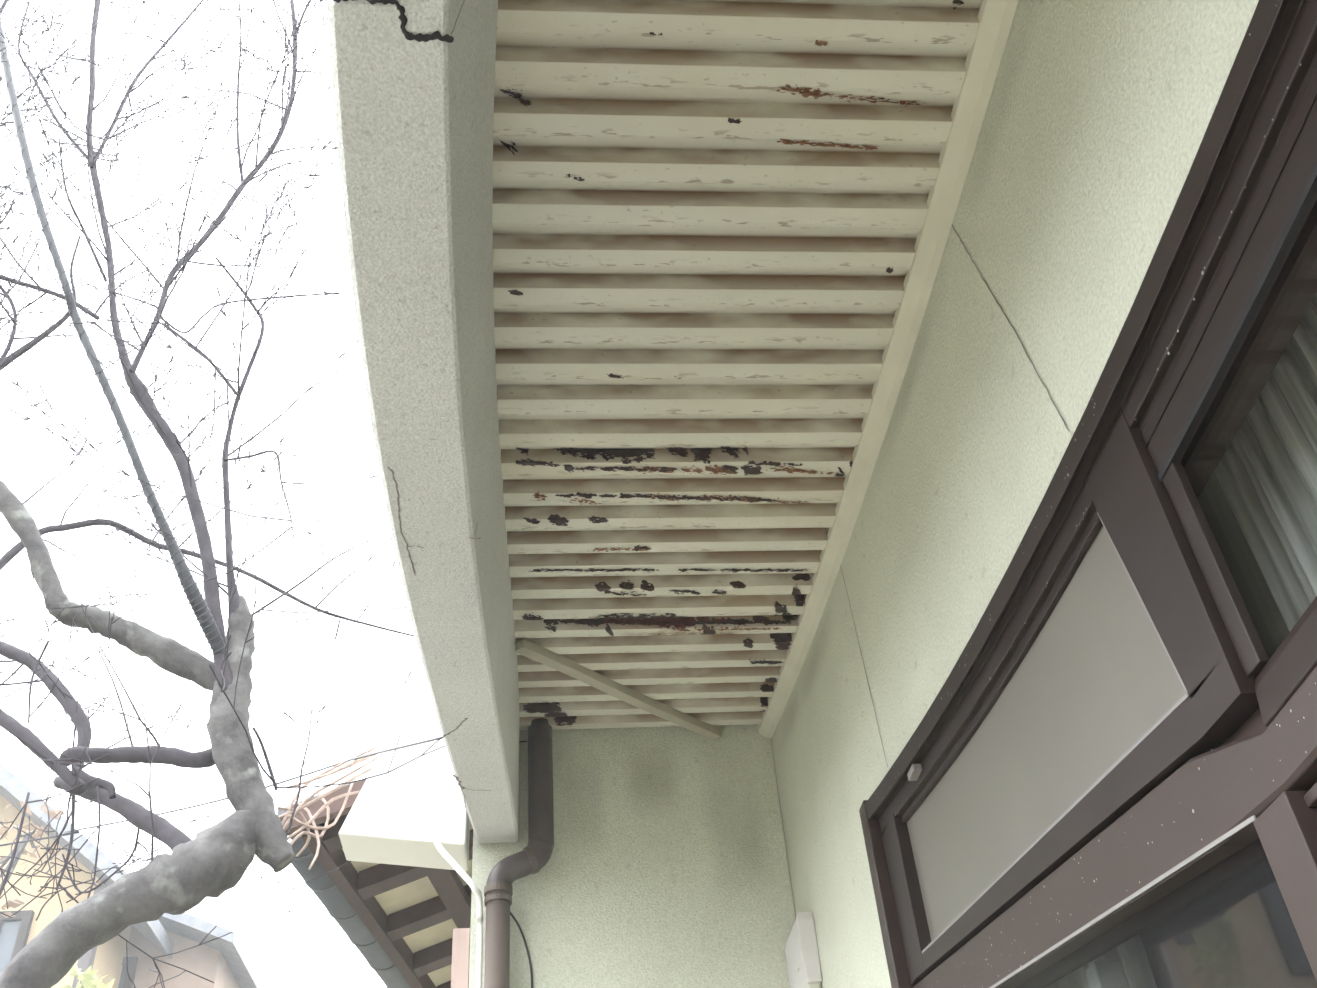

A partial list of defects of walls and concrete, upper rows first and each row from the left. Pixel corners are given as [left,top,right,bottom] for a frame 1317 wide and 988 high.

crack [319,0,465,43]
corrosion [775,84,921,107]
corrosion [777,138,878,150]
corrosion [515,458,834,476]
corrosion [533,491,809,505]
corrosion [522,612,559,633]
corrosion [577,614,793,636]